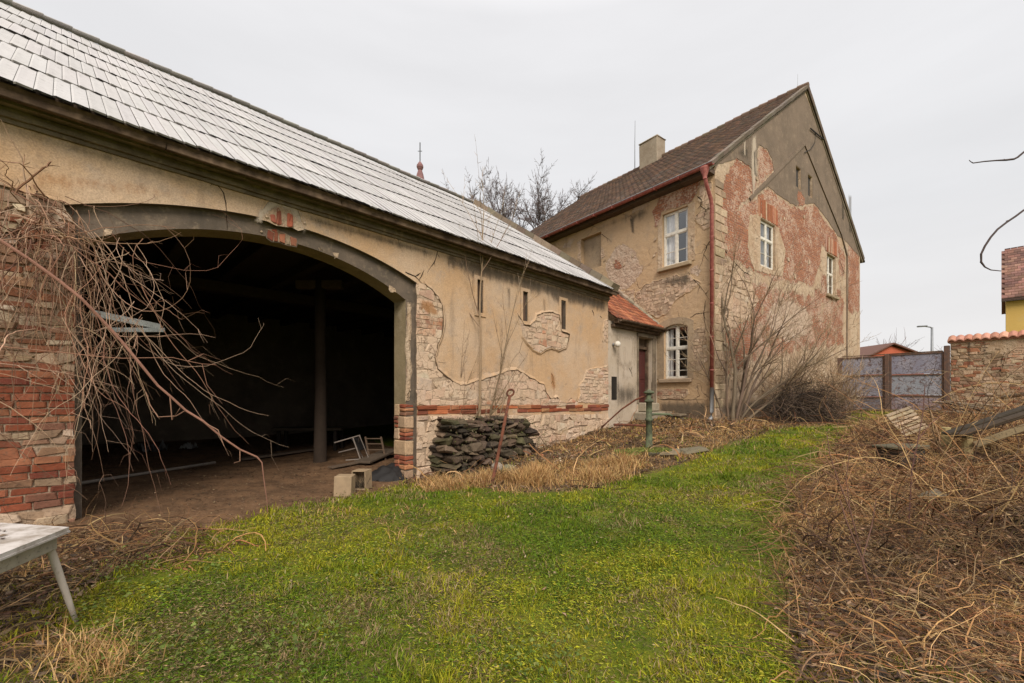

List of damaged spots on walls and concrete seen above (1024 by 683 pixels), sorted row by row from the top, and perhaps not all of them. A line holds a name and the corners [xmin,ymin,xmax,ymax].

spalling [260,200,306,247]
peeling [405,281,625,479]
peeling [601,244,702,319]
peeling [632,147,860,376]